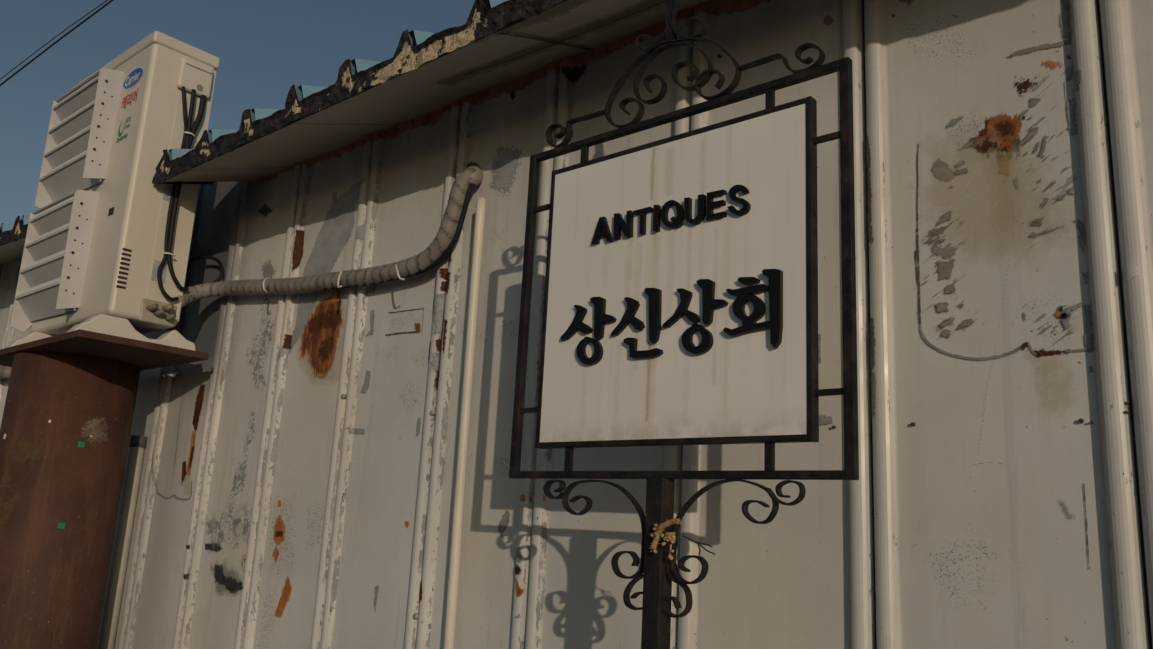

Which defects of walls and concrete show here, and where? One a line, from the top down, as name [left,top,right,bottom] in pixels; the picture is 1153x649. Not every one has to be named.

corrosion [258,0,769,182]
peeling [489,145,523,197]
peeling [931,116,978,188]
corrosion [975,114,1022,157]
corrosion [292,229,305,272]
peeling [923,211,973,338]
peeling [1023,186,1085,252]
corrosion [283,289,343,384]
peeling [1051,303,1093,352]
corrosion [181,384,206,485]
corrosion [257,500,294,649]